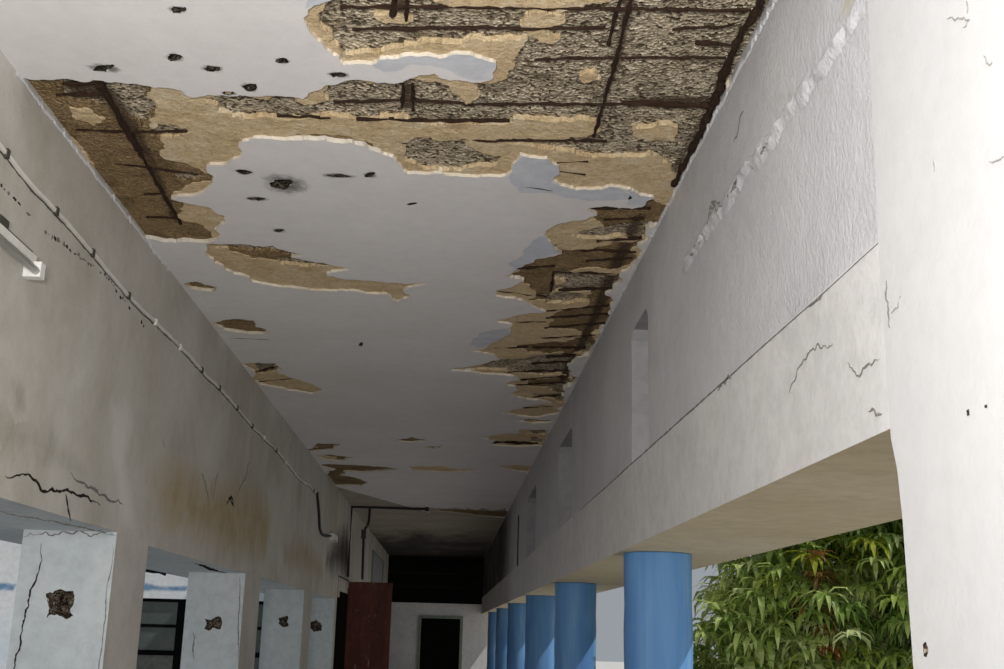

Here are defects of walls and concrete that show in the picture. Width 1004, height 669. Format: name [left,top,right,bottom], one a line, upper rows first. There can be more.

crack [947,0,970,28]
spalling [15,0,778,447]
crack [885,281,901,328]
crack [579,243,879,511]
damp [131,426,327,595]
crack [0,473,122,669]
spalling [46,589,75,619]
spalling [205,616,222,631]
spalling [310,620,322,632]